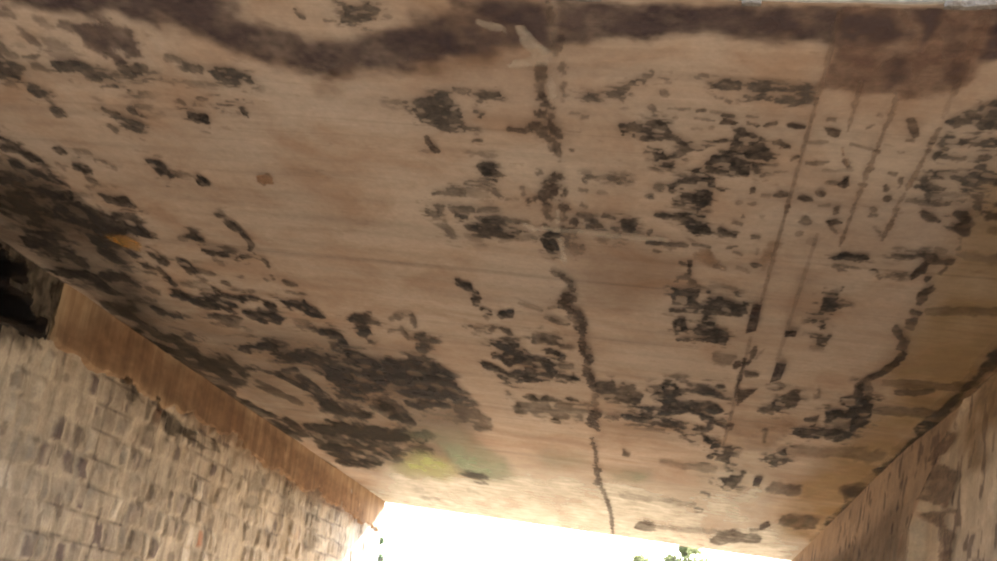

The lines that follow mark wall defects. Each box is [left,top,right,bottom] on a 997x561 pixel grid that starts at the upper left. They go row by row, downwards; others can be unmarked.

damp [16,0,903,76]
damp [914,9,940,41]
crack [506,44,579,238]
crack [455,278,514,319]
damp [101,301,862,560]
crack [540,270,621,535]
damp [872,350,997,481]